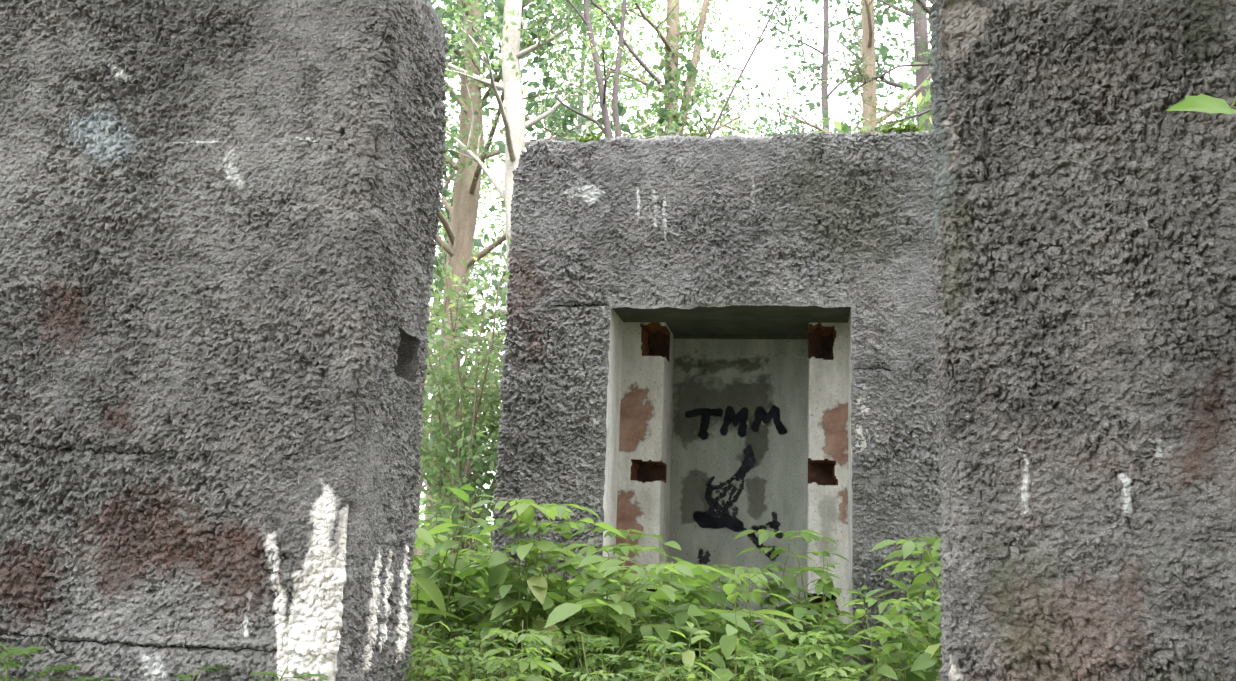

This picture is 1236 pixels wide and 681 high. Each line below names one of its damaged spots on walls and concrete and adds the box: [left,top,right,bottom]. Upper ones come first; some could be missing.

peeling [619,383,654,452]
peeling [822,403,848,466]
peeling [616,490,643,593]